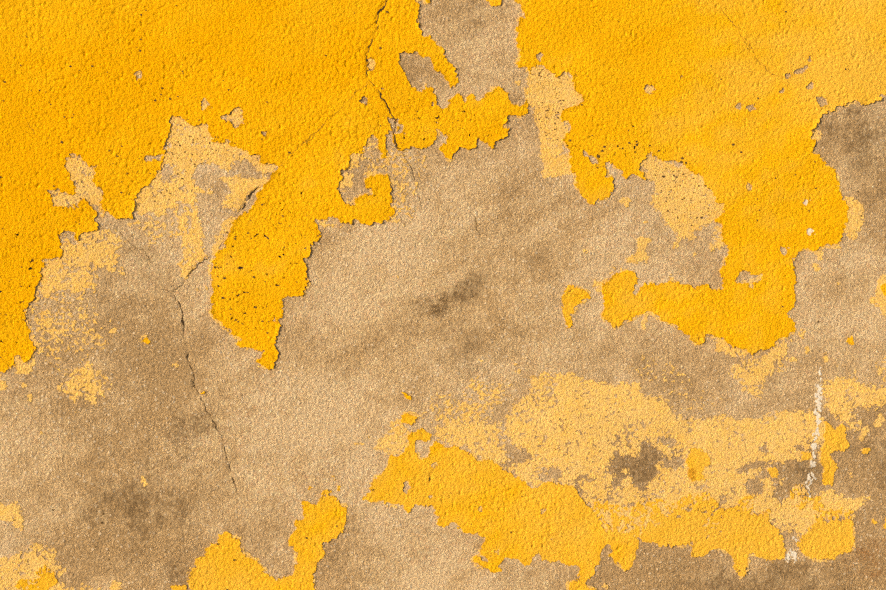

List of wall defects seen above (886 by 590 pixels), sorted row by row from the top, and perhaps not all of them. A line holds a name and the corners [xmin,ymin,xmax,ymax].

peeling [779,56,812,93]
peeling [220,106,244,128]
crack [281,1,422,208]
peeling [843,196,865,240]
peeling [735,269,763,289]
crack [160,255,237,490]
peeling [821,376,886,431]
peeling [818,489,867,517]